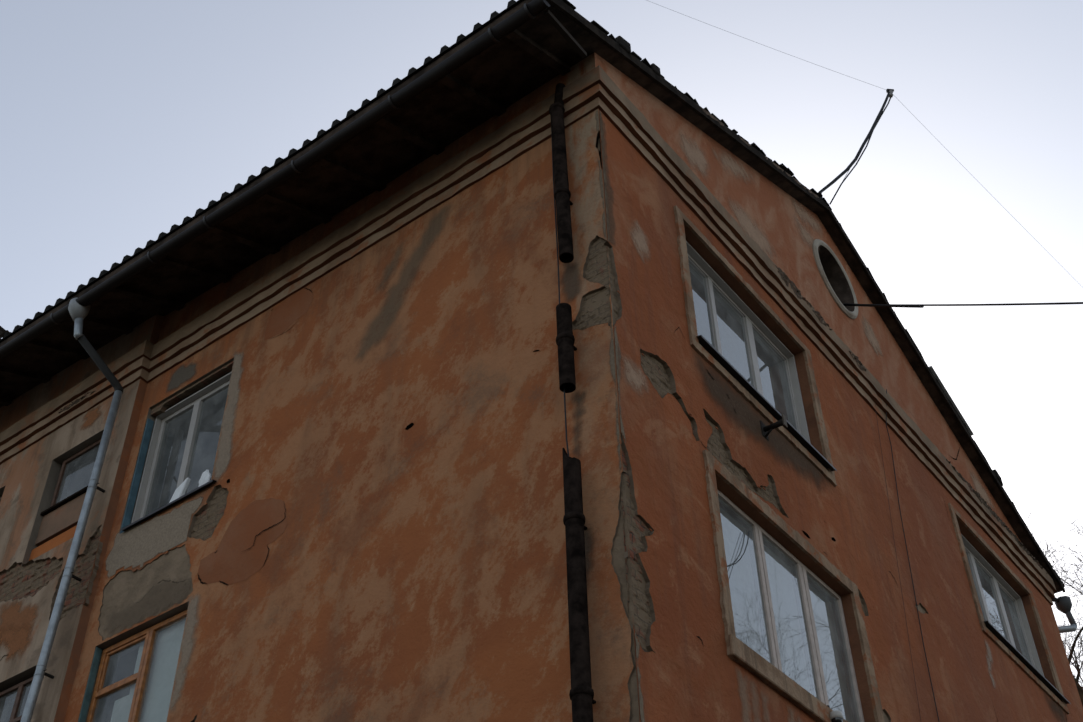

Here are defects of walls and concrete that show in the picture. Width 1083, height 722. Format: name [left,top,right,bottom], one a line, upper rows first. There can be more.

spalling [572,111,655,722]